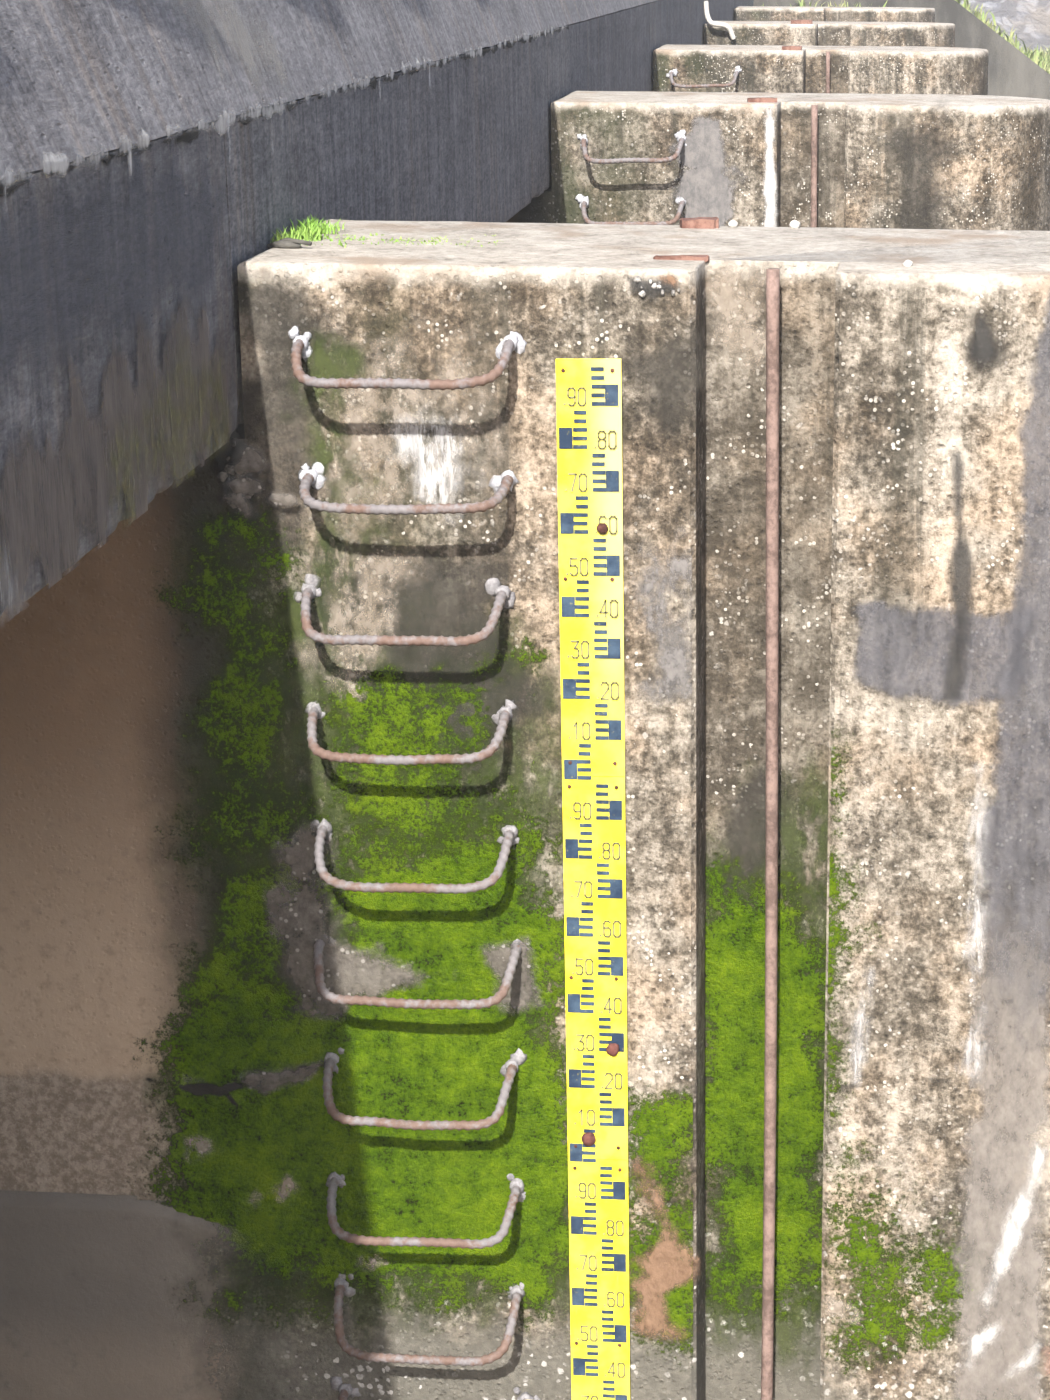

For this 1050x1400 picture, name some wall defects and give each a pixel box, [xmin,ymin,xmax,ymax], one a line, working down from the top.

damp [968,312,1004,371]
damp [343,558,541,744]
damp [945,453,972,698]
damp [983,1146,1045,1303]
damp [971,1327,997,1355]
damp [1014,1345,1038,1369]